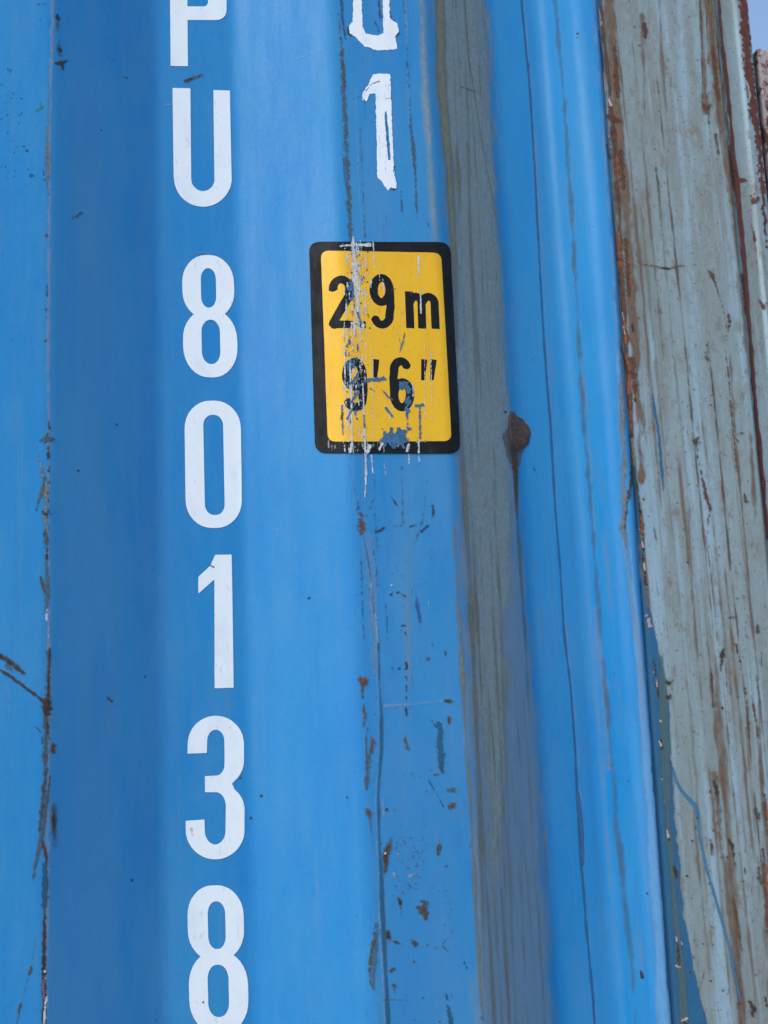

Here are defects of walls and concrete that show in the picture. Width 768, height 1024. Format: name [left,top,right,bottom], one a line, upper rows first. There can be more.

peeling [328,236,433,459]
corrosion [598,0,680,628]
corrosion [679,0,768,1024]
corrosion [0,648,57,774]
corrosion [358,677,376,790]
corrosion [368,923,398,984]
corrosion [416,900,429,920]